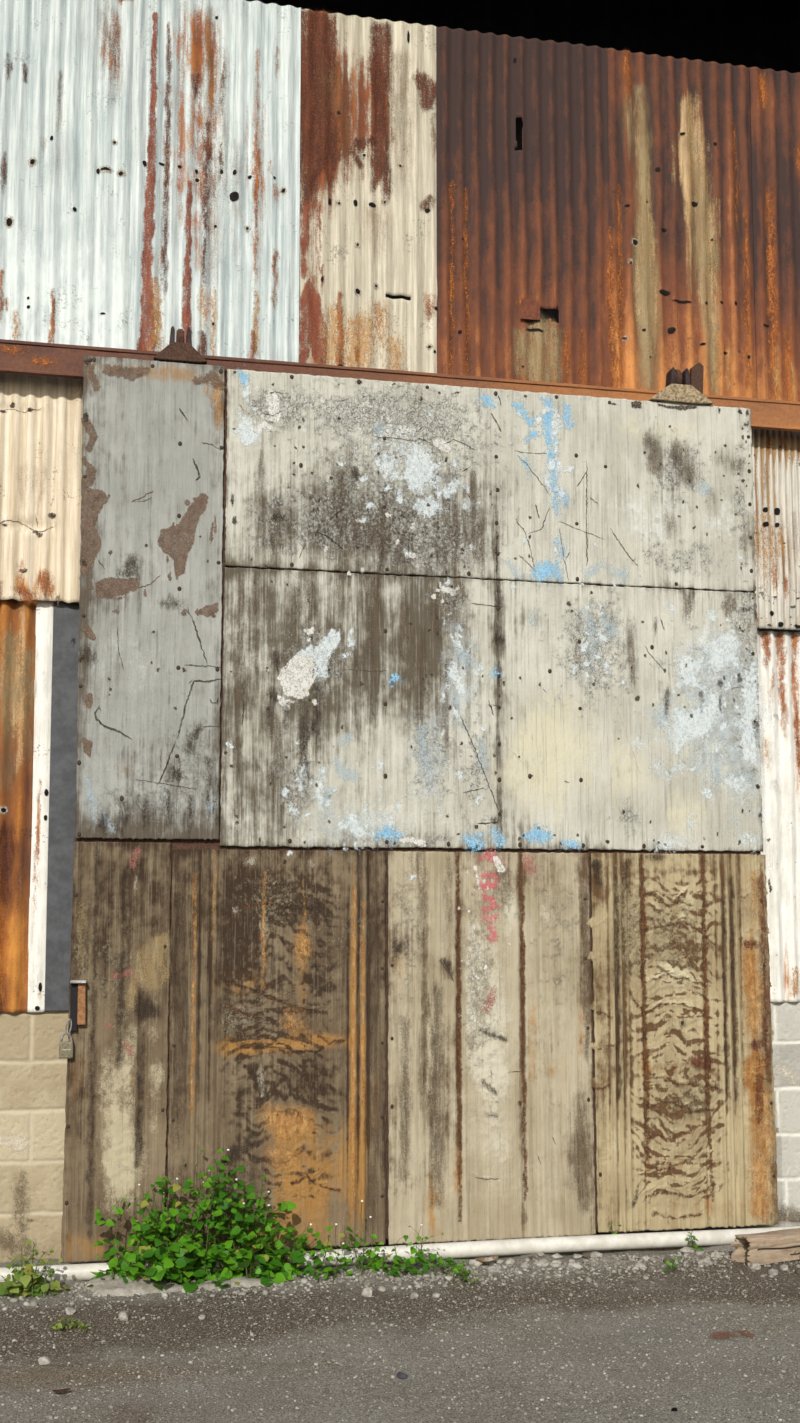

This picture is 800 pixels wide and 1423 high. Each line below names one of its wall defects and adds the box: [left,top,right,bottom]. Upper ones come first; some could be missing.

rust [415,71,436,110]
rust [86,12,227,413]
rust [250,51,280,359]
rust [299,10,404,371]
rust [607,51,661,390]
peeling [233,371,289,447]
peeling [145,493,237,581]
peeling [181,602,219,618]
damp [266,691,309,788]
peeling [266,627,355,711]
peeling [355,435,493,718]
rust [757,618,800,774]